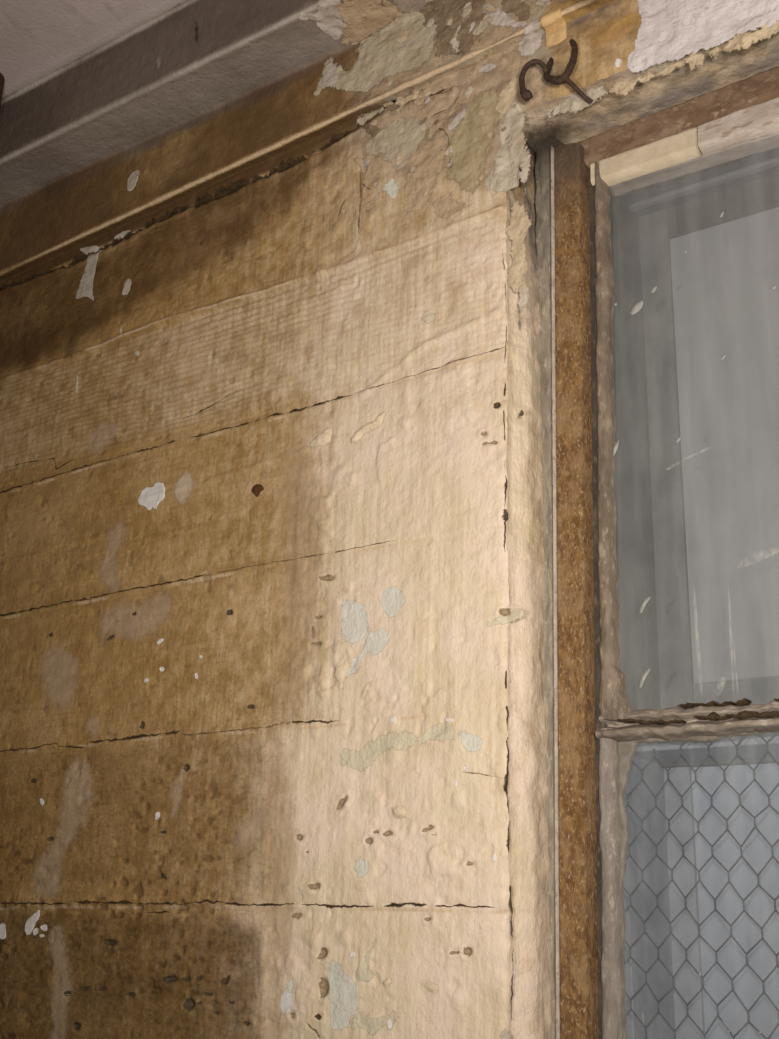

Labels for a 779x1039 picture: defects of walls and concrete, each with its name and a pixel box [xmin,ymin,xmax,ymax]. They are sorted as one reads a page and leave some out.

peeling [299,0,552,218]
leakage [527,122,569,151]
peeling [547,0,779,118]
peeling [76,245,101,300]
leakage [0,186,265,365]
crack [0,249,507,493]
peeling [137,482,165,510]
leakage [174,473,193,502]
crack [0,720,334,752]
crack [465,670,510,853]
leakage [26,925,83,1039]
crack [2,885,514,1018]